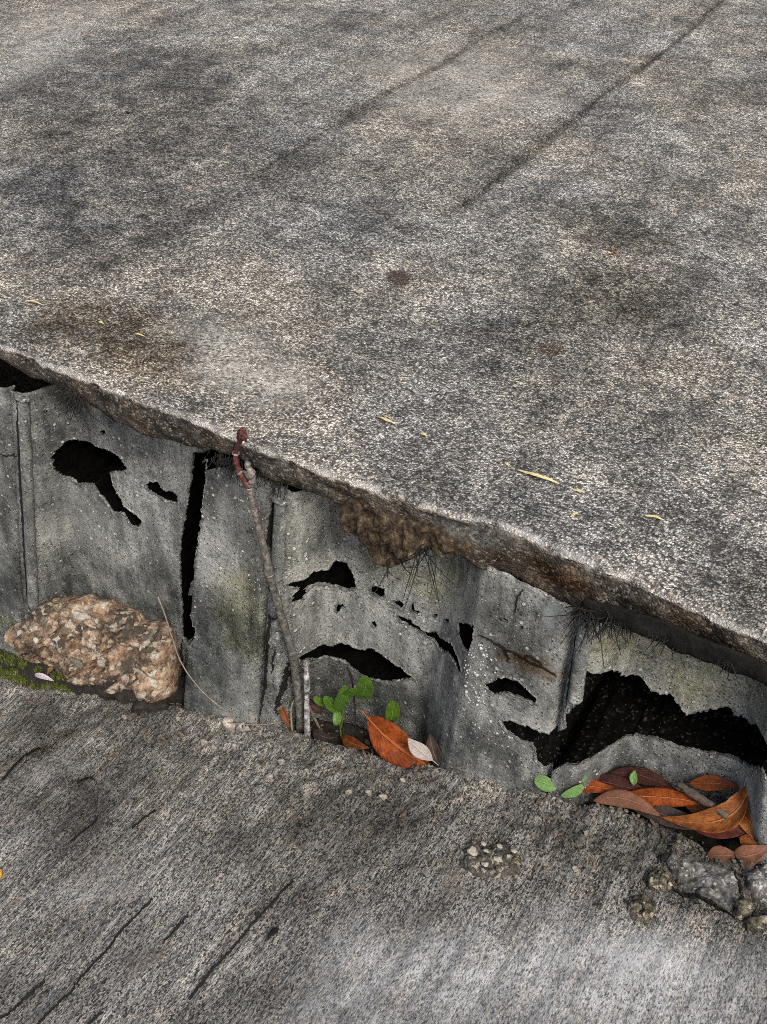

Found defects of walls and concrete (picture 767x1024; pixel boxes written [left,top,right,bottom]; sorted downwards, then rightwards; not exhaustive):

spalling [49,430,142,530]
spalling [144,450,212,650]
spalling [286,560,386,613]
spalling [297,642,418,683]
spalling [483,675,537,706]
spalling [499,704,767,780]
spalling [587,668,767,744]
crack [0,898,153,1024]
crack [188,880,294,1000]